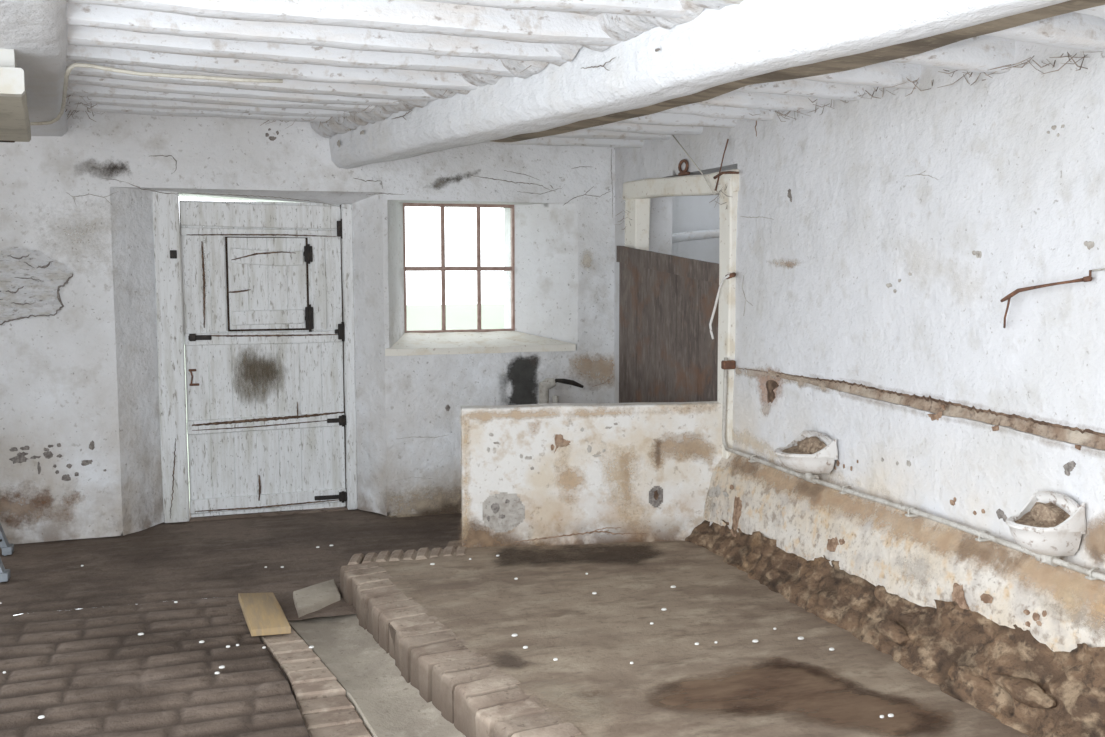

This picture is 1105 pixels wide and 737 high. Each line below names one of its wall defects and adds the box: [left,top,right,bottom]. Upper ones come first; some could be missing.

water stain [91,166,123,177]
peeling [0,247,73,326]
peeling [9,441,95,481]
spalling [738,368,1105,476]
spalling [483,492,525,533]
spalling [685,484,1105,737]